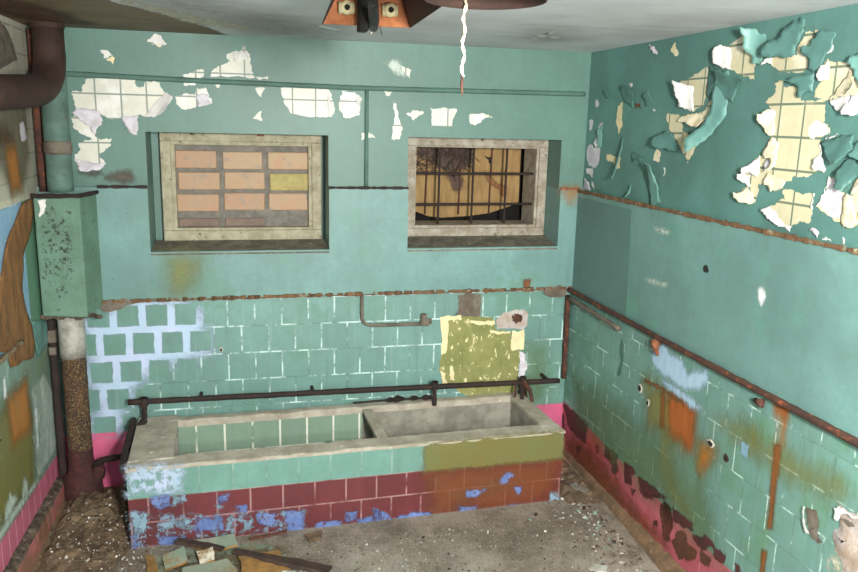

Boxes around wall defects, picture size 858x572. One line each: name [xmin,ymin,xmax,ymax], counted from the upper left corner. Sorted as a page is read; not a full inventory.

leakage [0,0,224,35]
peeling [281,87,362,118]
peeling [384,91,457,140]
peeling [583,17,858,245]
corrosion [0,381,34,525]
peeling [85,298,223,474]
peeling [129,494,431,548]
peeling [439,293,528,396]
peeling [562,403,740,572]
corrosion [644,378,714,475]
peeling [652,344,708,410]
corrosion [767,407,787,529]